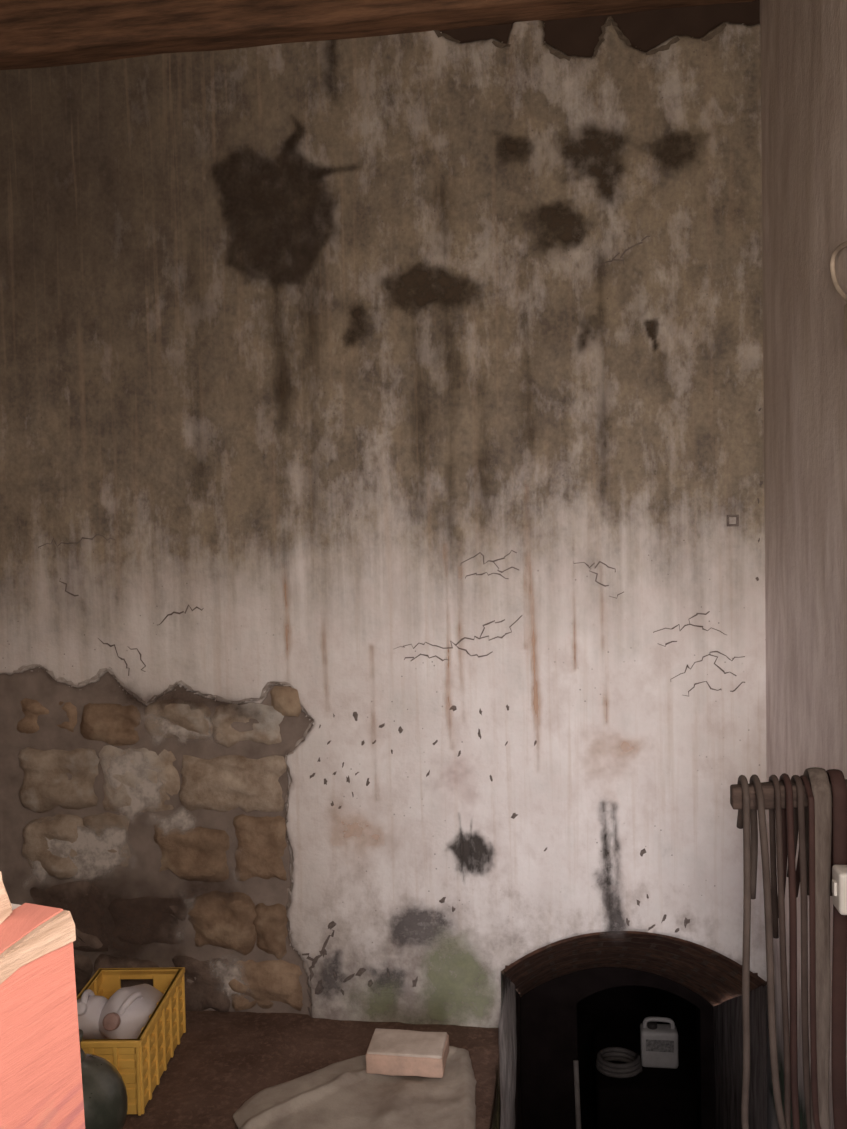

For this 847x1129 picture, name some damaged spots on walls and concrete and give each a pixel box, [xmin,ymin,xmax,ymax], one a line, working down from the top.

peeling [434,23,513,49]
peeling [542,0,760,61]
water stain [562,126,624,201]
water stain [213,122,336,346]
water stain [384,263,479,312]
crack [460,550,519,579]
crack [573,561,624,598]
crack [395,615,522,661]
crack [653,611,745,696]
spalling [0,664,373,1016]
water stain [449,831,493,874]
water stain [599,829,626,933]